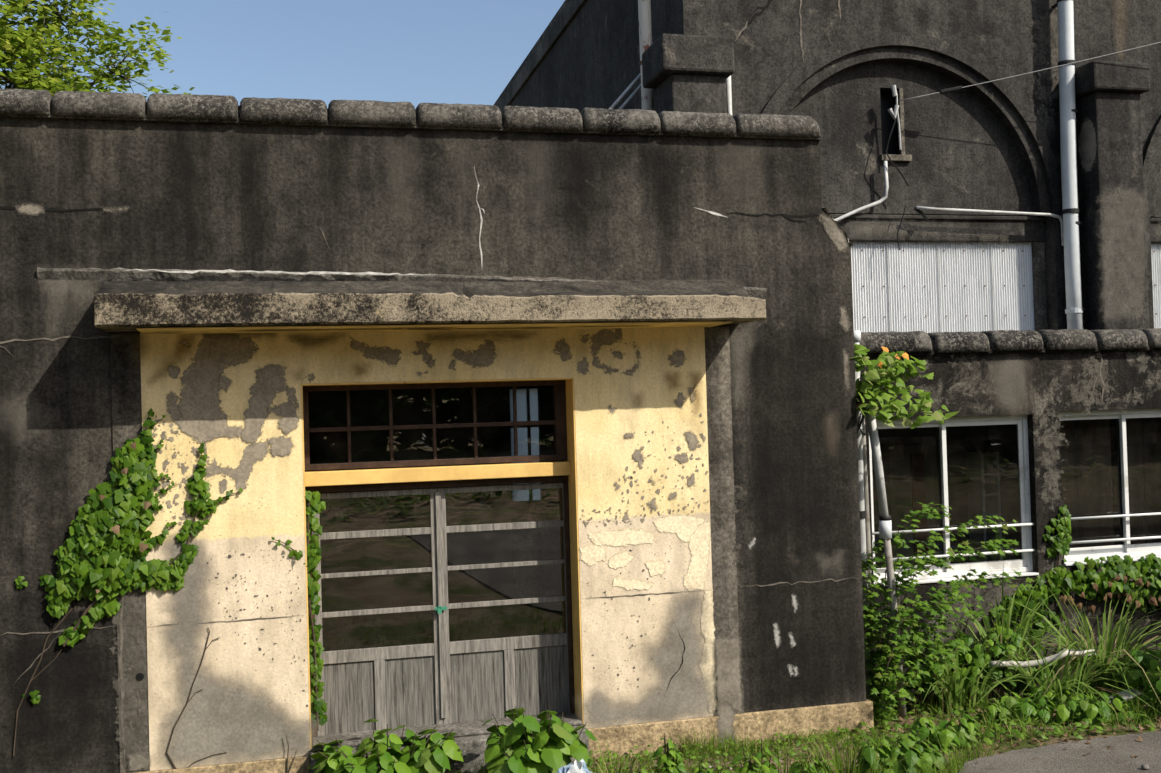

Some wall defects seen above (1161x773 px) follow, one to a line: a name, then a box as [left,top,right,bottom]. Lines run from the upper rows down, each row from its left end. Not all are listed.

crack [734,0,804,61]
crack [474,167,485,264]
peeling [350,337,436,377]
peeling [449,340,497,370]
peeling [553,328,641,375]
peeling [668,349,687,367]
peeling [151,333,299,525]
peeling [580,387,718,713]